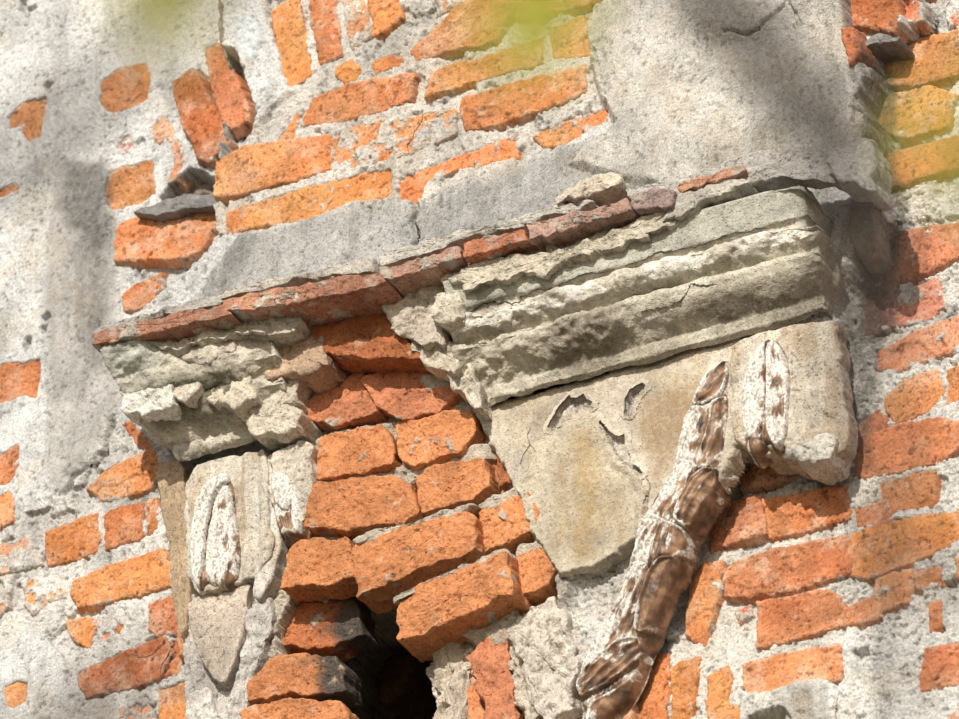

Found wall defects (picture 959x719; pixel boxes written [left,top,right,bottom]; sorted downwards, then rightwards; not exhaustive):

spalling [99,0,613,320]
spalling [853,0,959,205]
spalling [891,214,959,311]
spalling [4,682,28,708]
spalling [0,361,41,403]
spalling [0,417,184,698]
spalling [82,657,187,719]
spalling [239,314,652,719]
spalling [620,330,889,719]
spalling [882,273,959,574]
spalling [913,579,959,719]